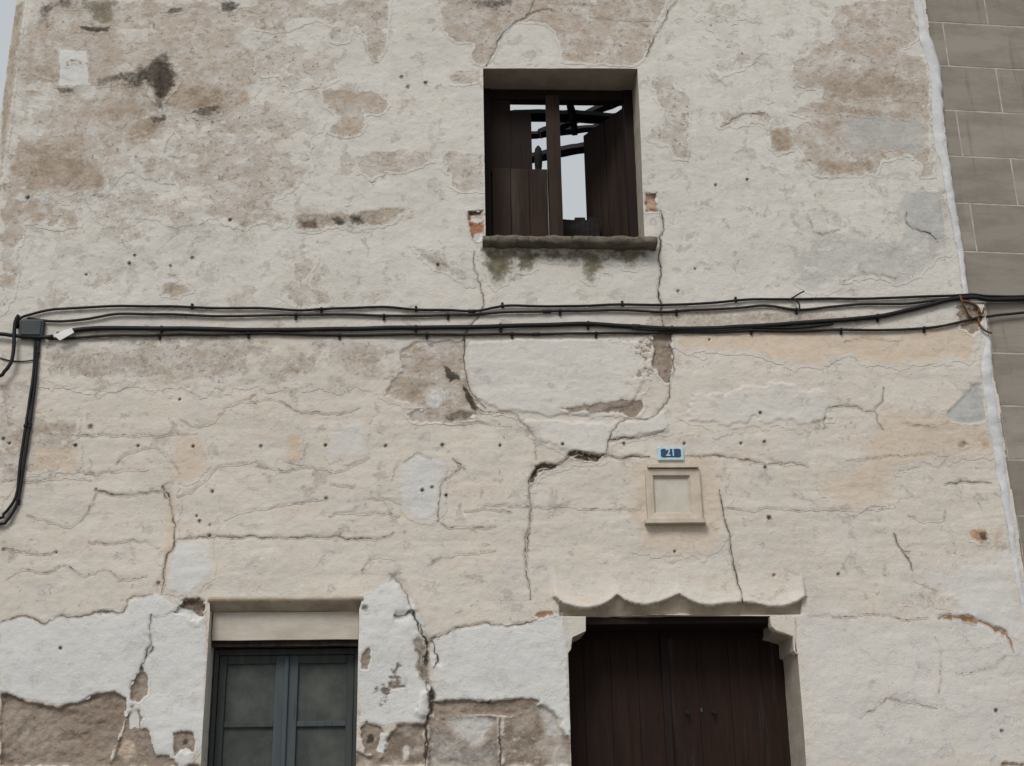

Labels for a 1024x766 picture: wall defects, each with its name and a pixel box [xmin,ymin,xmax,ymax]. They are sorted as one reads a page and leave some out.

peeling [0,0,393,316]
peeling [782,0,952,298]
flaking render [465,206,486,243]
damp [578,249,644,286]
spalling [377,336,482,426]
spalling [558,331,676,421]
crack [0,208,676,766]
crack [718,387,992,615]
spalling [0,665,201,766]
spalling [358,645,373,672]
flaking render [356,651,571,766]